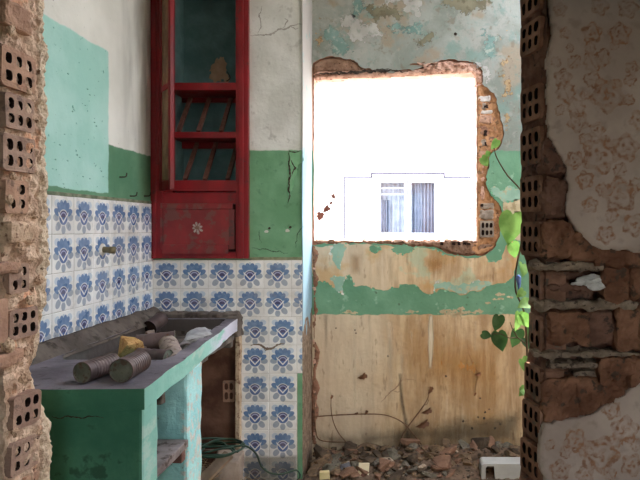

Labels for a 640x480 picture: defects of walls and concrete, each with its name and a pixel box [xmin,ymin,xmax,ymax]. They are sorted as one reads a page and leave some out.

spalling [0,0,32,36]
crack [250,7,302,36]
spalling [0,44,40,255]
spalling [312,0,640,480]
spalling [0,261,45,369]
spalling [4,370,43,480]
water stain [370,394,515,440]